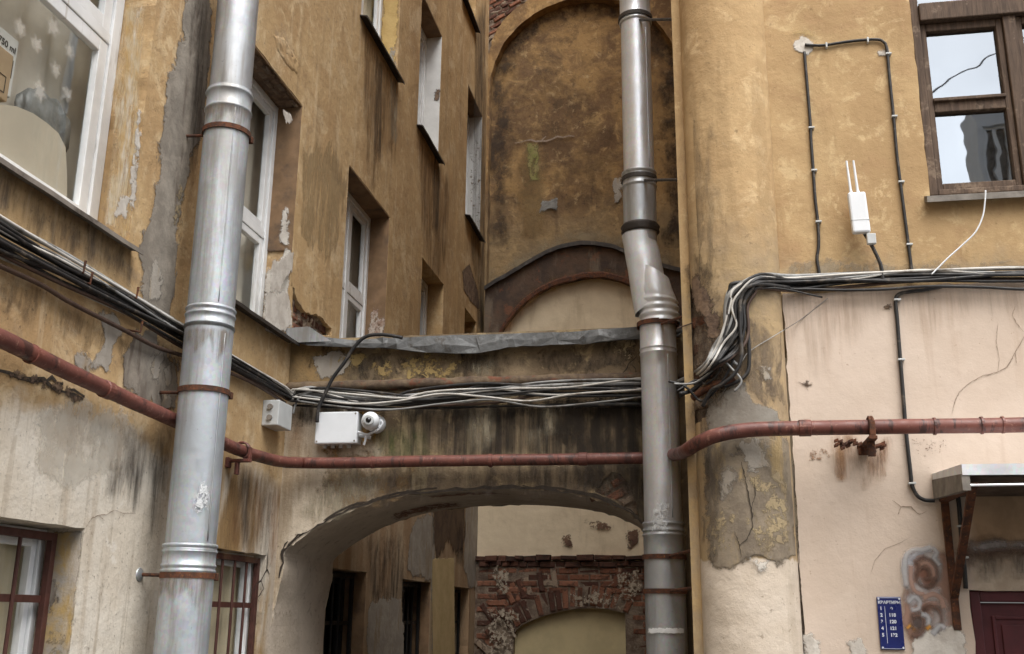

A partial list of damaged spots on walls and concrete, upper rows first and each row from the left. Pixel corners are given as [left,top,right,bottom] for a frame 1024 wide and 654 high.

peeling [106,3,144,238]
peeling [139,0,213,315]
water stain [473,3,624,326]
water stain [650,26,679,241]
flaking render [263,143,346,337]
crack [0,369,85,403]
peeling [75,310,180,410]
water stain [299,403,367,422]
water stain [402,395,644,494]
crack [734,462,756,557]
peeling [702,436,798,572]
crack [953,308,1024,407]